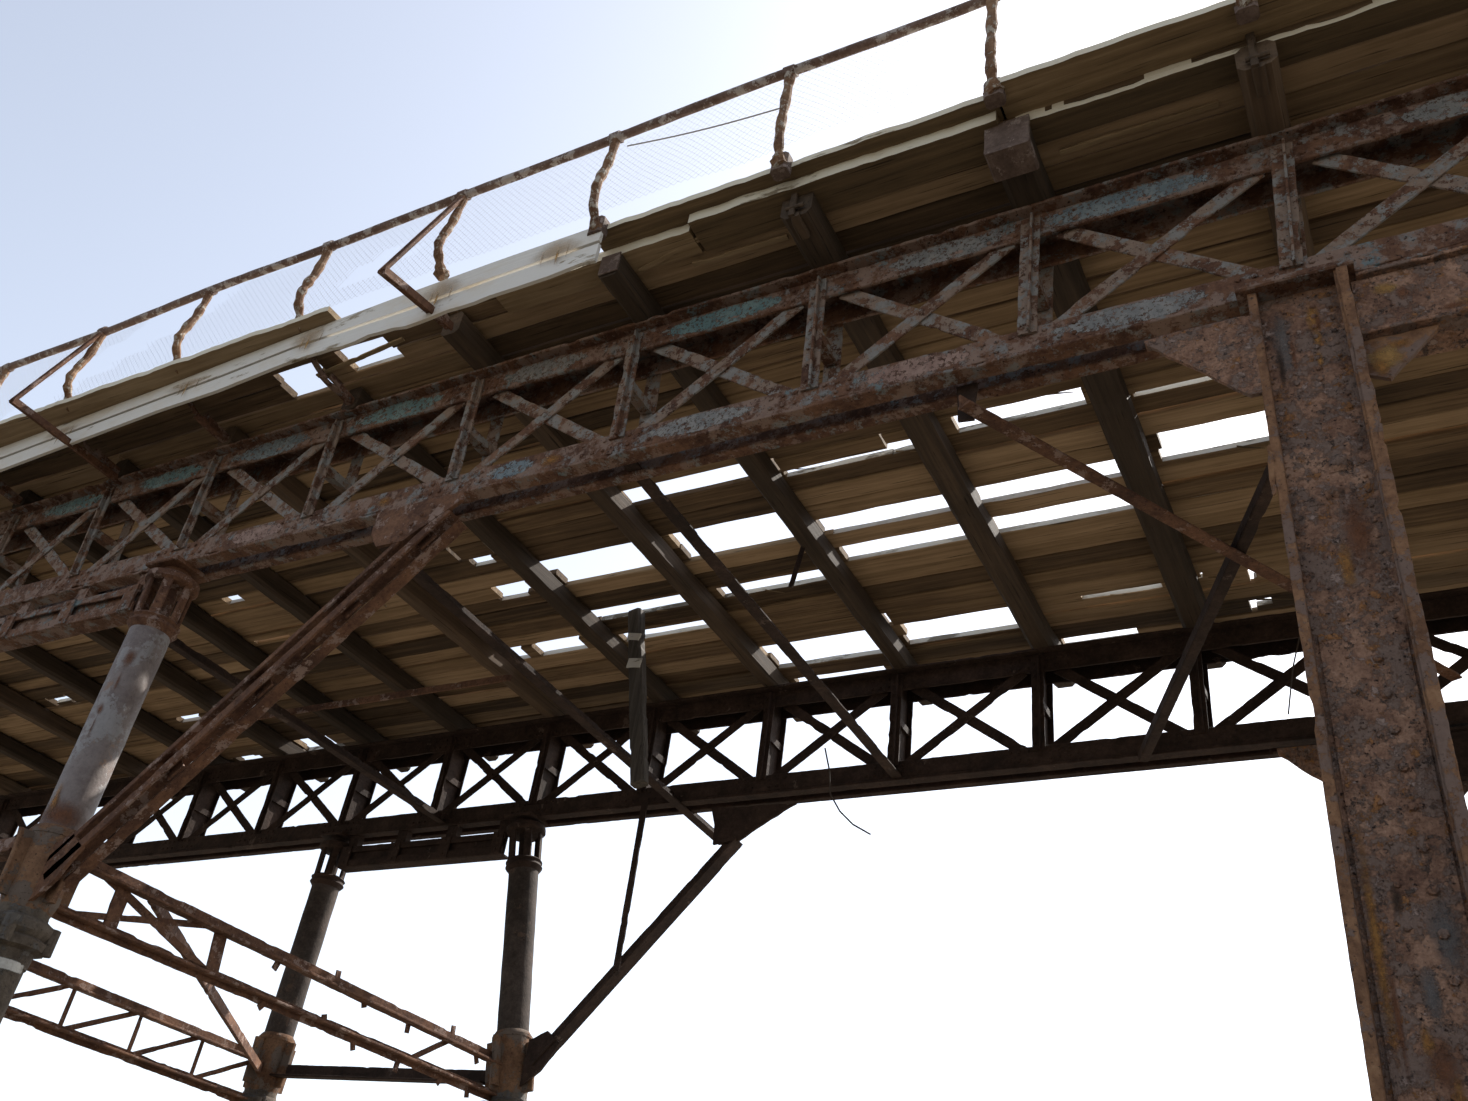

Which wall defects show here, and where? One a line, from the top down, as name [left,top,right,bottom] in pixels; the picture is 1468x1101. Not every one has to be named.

peeling [1397,91,1468,123]
peeling [1043,170,1212,226]
peeling [888,231,1004,272]
peeling [1048,290,1208,334]